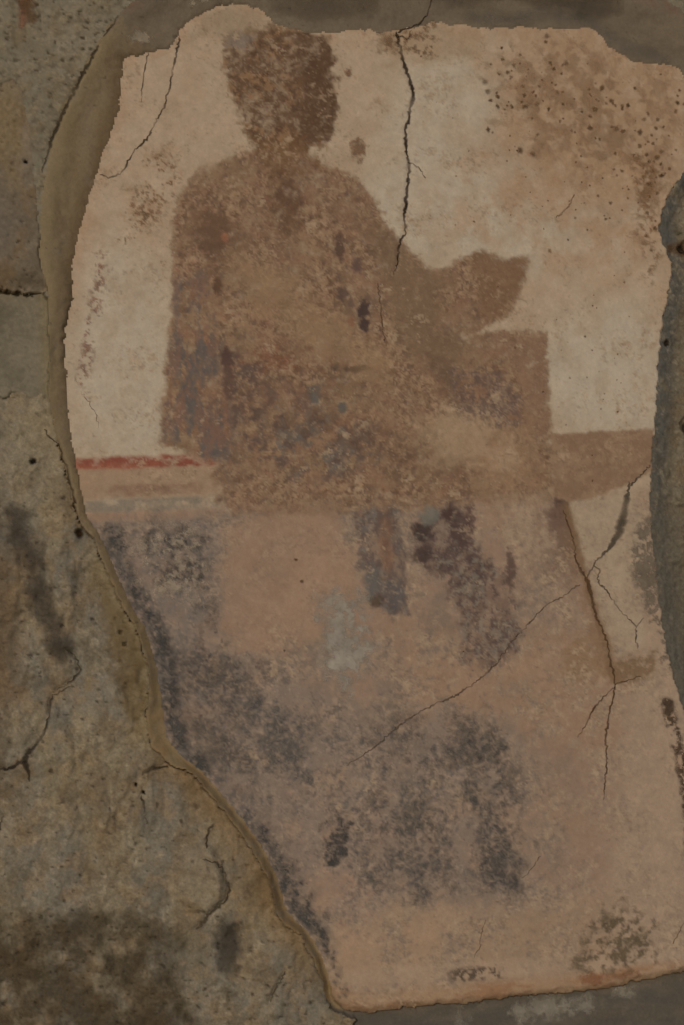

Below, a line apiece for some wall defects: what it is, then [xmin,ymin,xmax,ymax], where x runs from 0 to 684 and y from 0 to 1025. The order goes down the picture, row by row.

crack [99,38,180,178]
crack [395,14,428,268]
crack [348,467,648,791]
spalling [611,126,684,808]